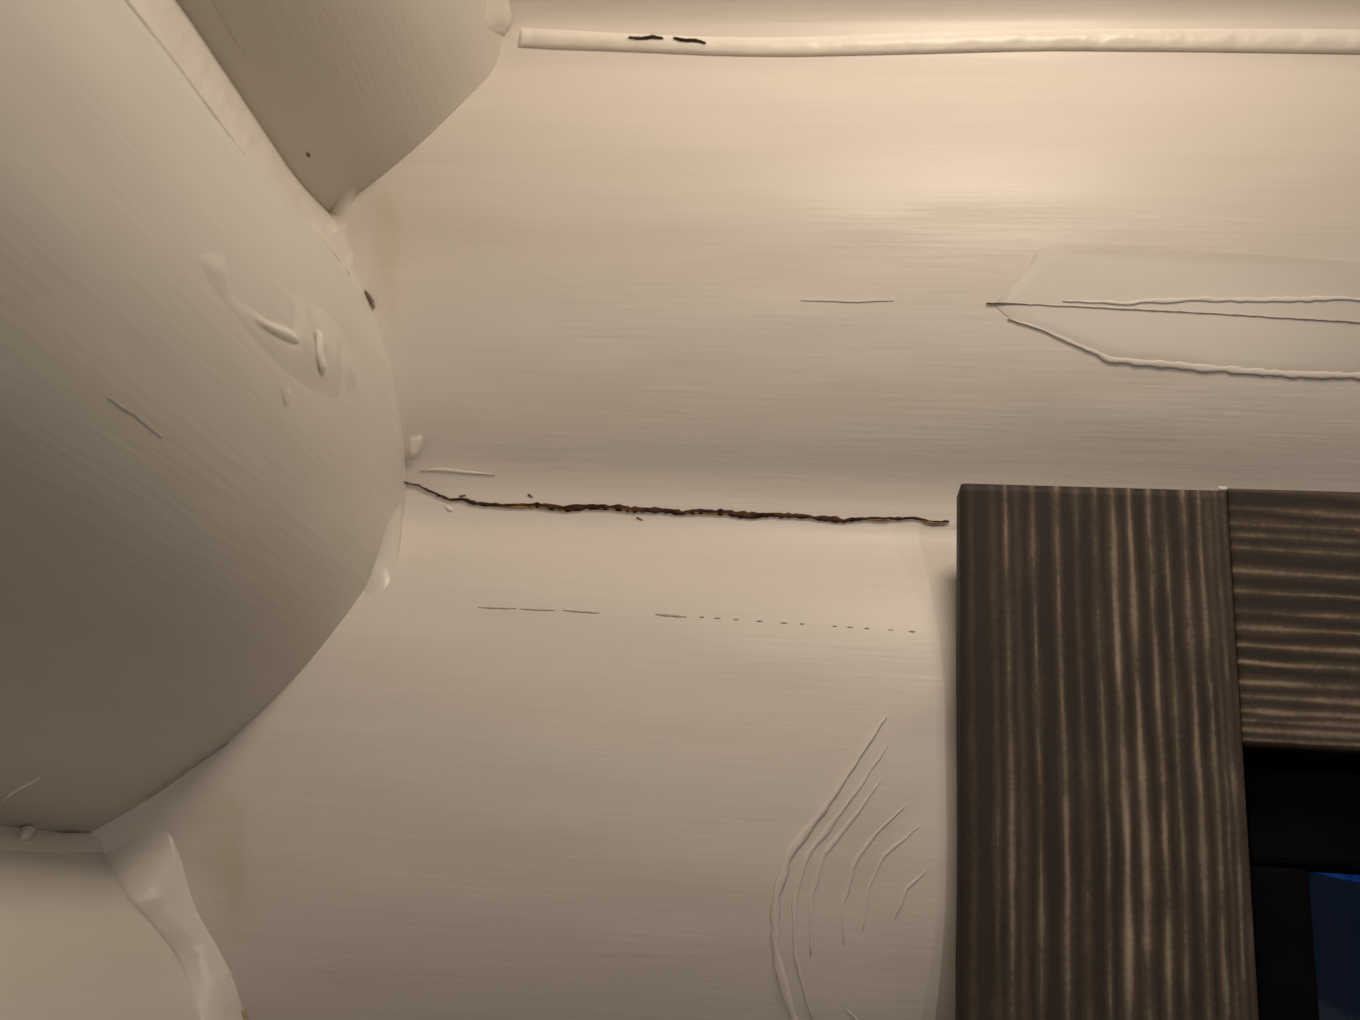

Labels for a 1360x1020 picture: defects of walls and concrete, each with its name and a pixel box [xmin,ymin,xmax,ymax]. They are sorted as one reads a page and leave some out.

crack [628,35,706,44]
crack [404,468,949,525]